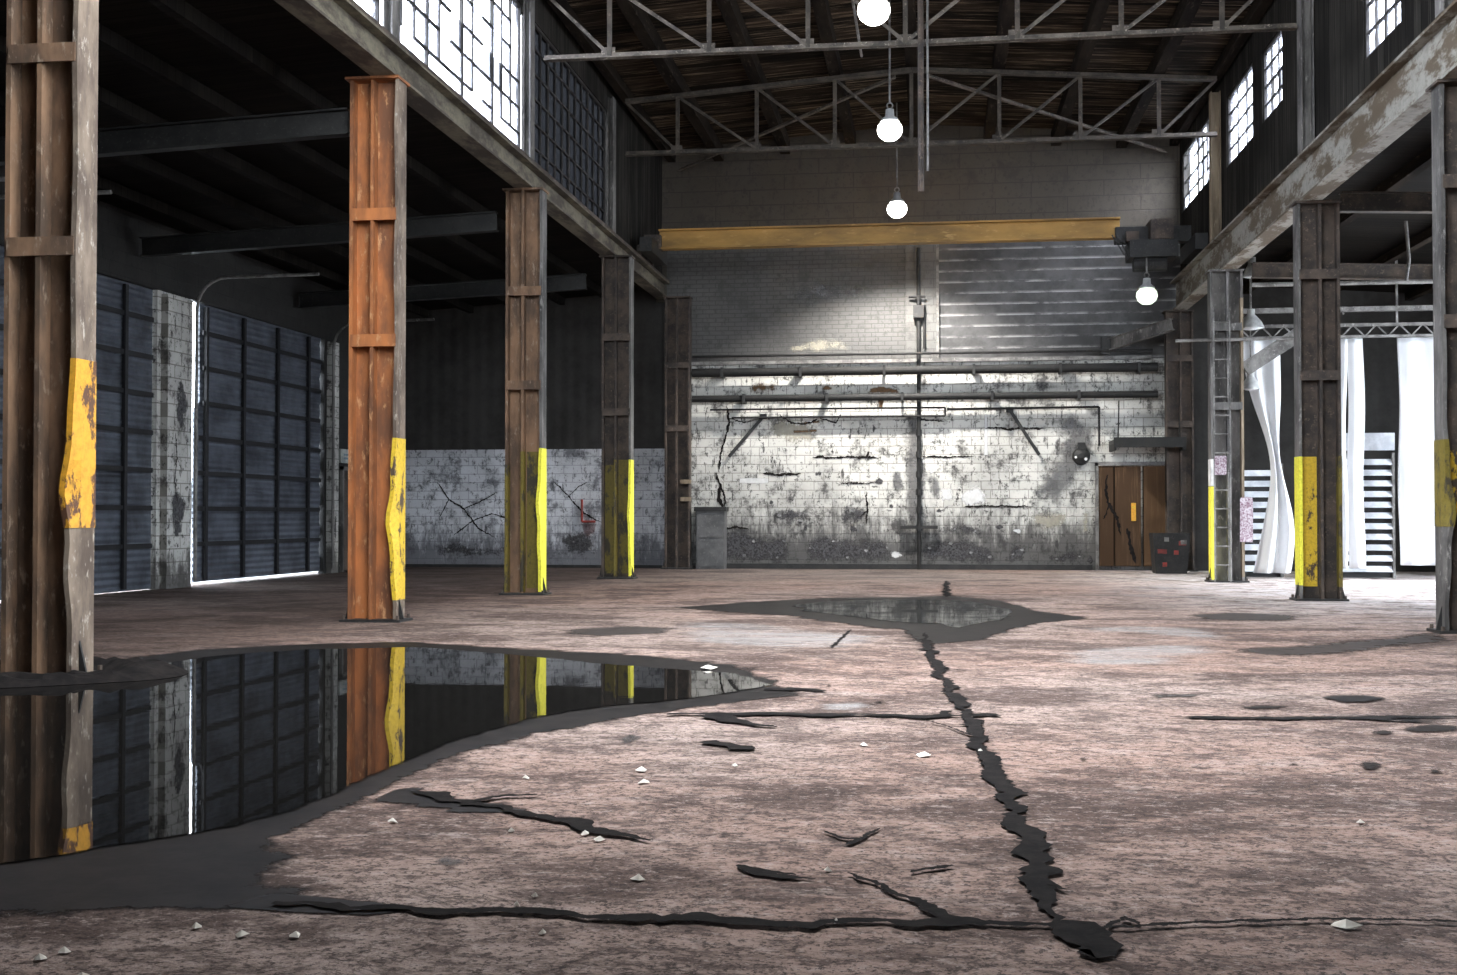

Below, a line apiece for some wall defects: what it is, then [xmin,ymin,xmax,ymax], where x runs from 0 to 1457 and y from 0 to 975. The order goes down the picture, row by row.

peeling [727,500,888,563]
peeling [923,523,1025,563]
water stain [676,596,1089,643]
water stain [0,626,799,917]
crack [272,633,1457,958]